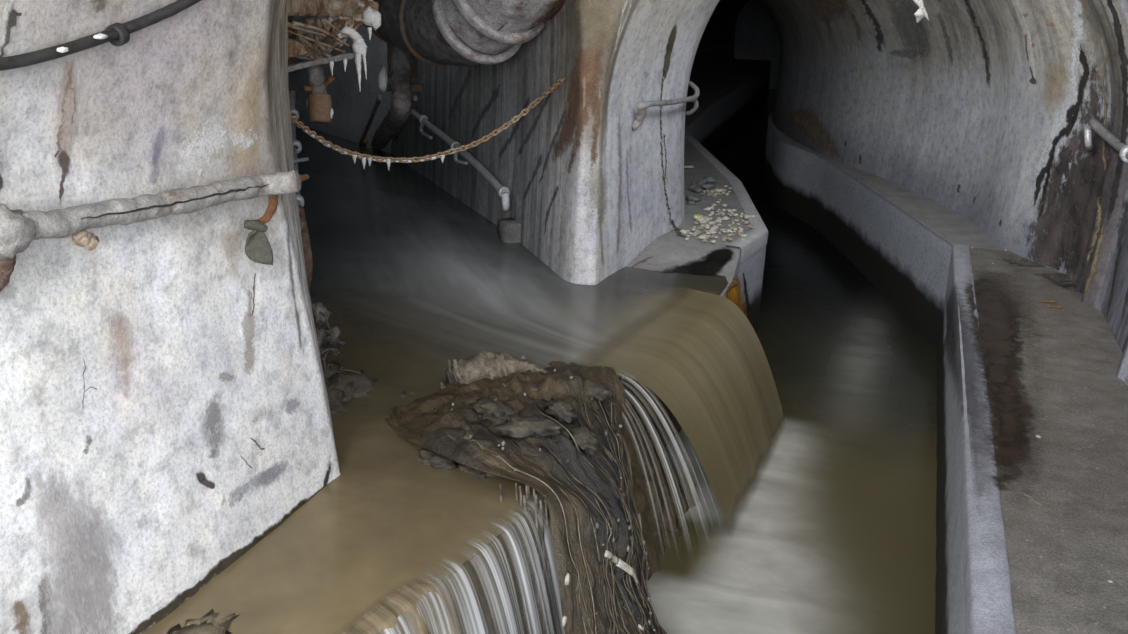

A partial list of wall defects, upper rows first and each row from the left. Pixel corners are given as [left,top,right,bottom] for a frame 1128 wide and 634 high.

crack [0,0,22,58]
corrosion [553,43,604,173]
damp [1032,0,1084,181]
damp [1106,0,1128,317]
corrosion [726,278,748,319]